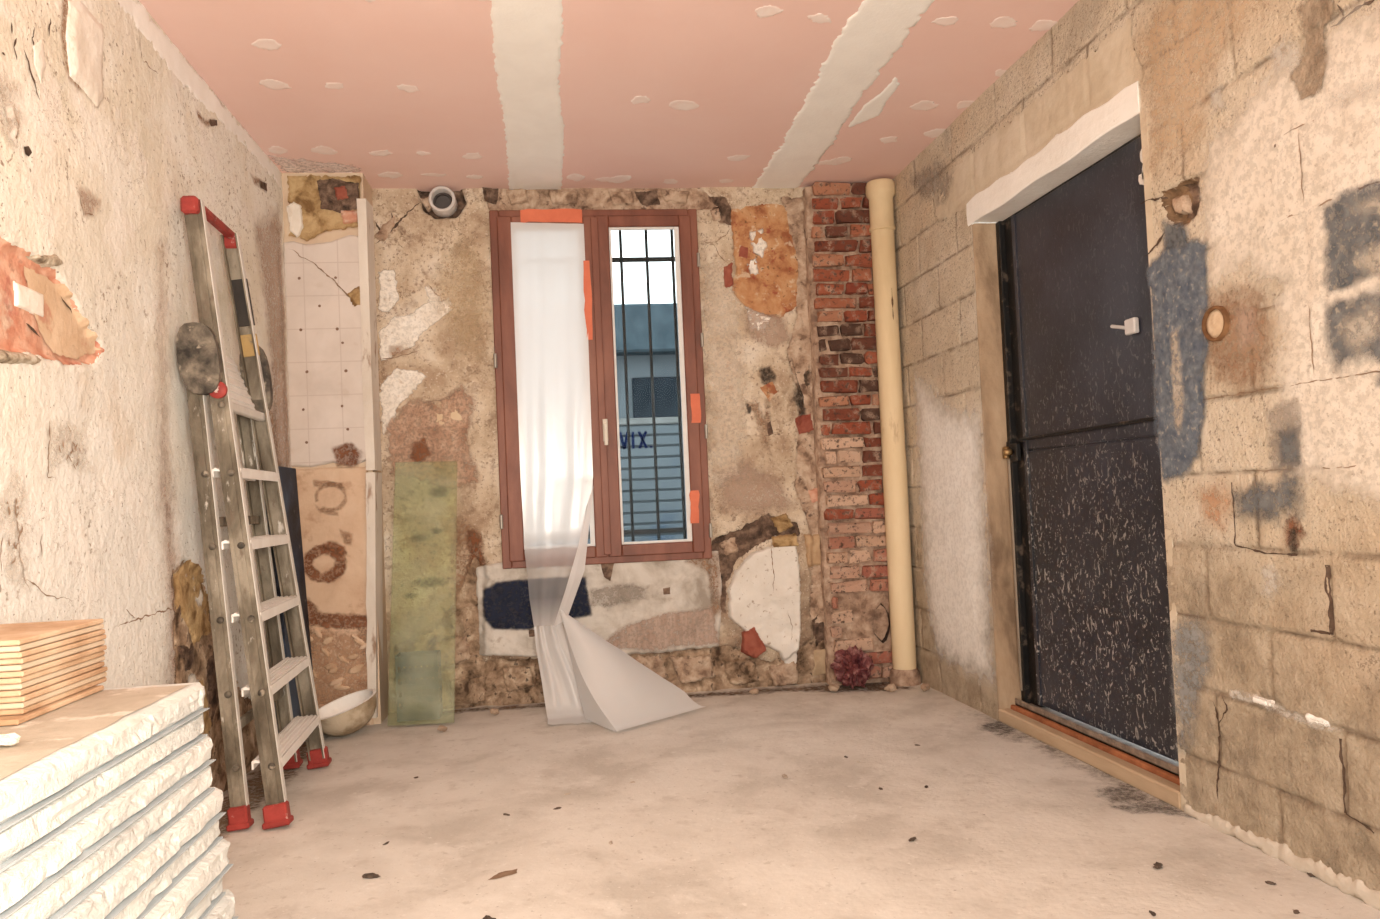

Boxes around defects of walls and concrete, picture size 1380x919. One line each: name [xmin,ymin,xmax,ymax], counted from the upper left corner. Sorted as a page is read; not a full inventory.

peeling [61,0,104,107]
spalling [0,236,105,365]
spalling [79,189,97,216]
spalling [418,190,467,219]
peeling [1140,0,1380,499]
spalling [378,270,478,489]
spalling [482,187,826,693]
spalling [393,556,545,713]
crack [1213,697,1228,802]